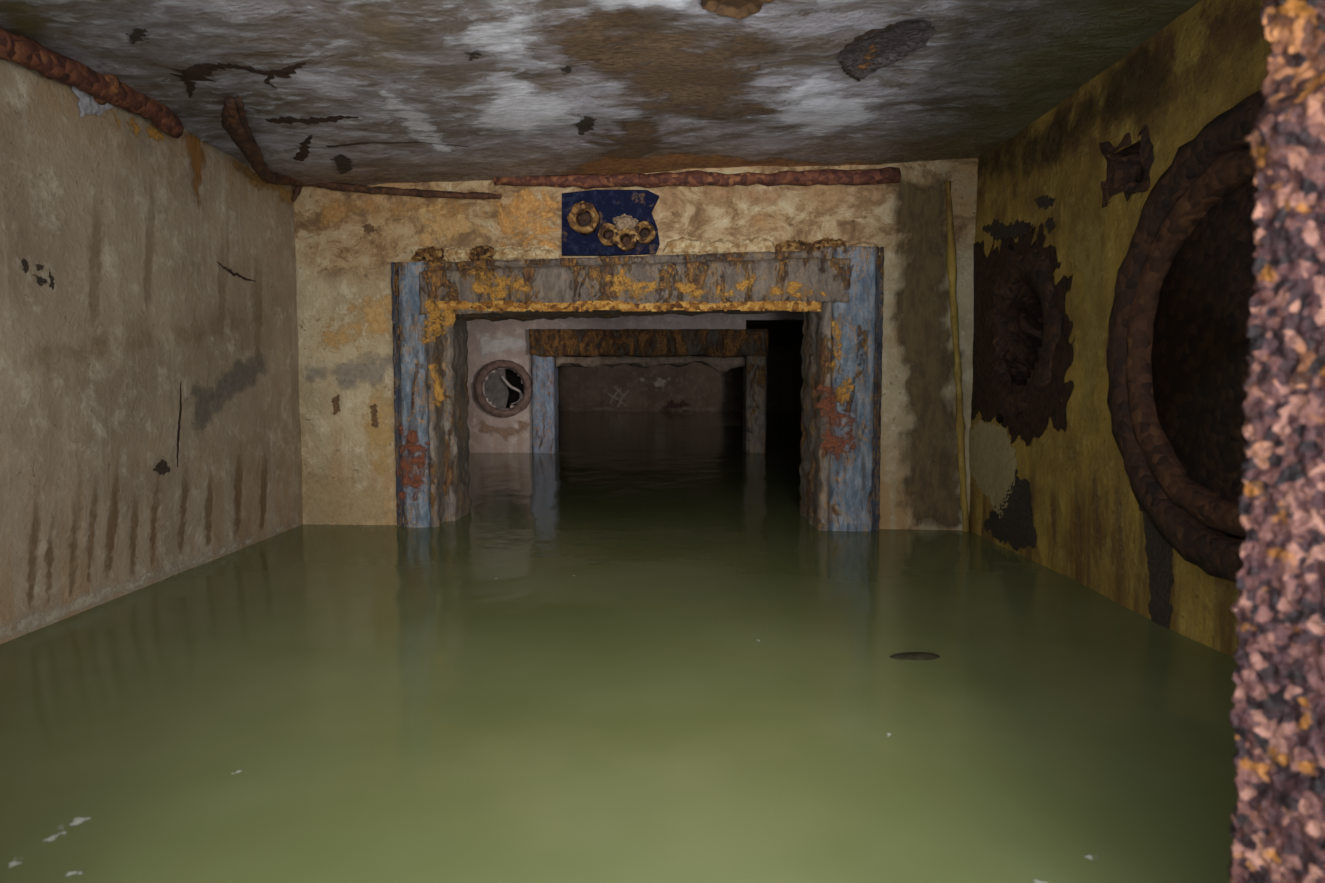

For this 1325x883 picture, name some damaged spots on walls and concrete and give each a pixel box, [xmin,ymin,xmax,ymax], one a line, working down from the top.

spalling [837,20,936,82]
crack [166,62,468,161]
corrosion [184,134,205,205]
corrosion [563,153,882,175]
corrosion [705,185,780,207]
corrosion [421,269,856,461]
corrosion [364,399,430,502]
damp [0,524,284,638]
corrosion [1139,506,1174,629]